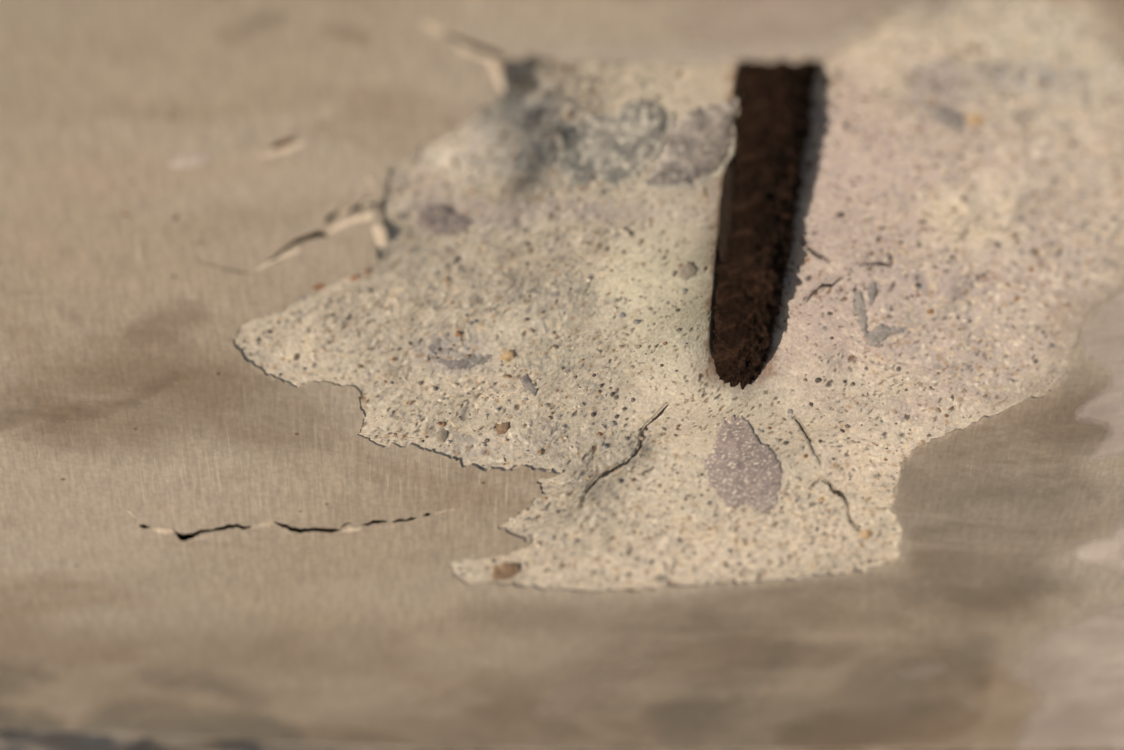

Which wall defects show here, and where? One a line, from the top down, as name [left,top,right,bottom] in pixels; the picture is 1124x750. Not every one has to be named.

crack [253,176,388,272]
corrosion [712,57,817,390]
spalling [230,0,1124,593]
damp [1078,290,1124,458]
crack [126,510,431,541]
damp [1078,528,1124,570]
damp [1015,609,1124,749]